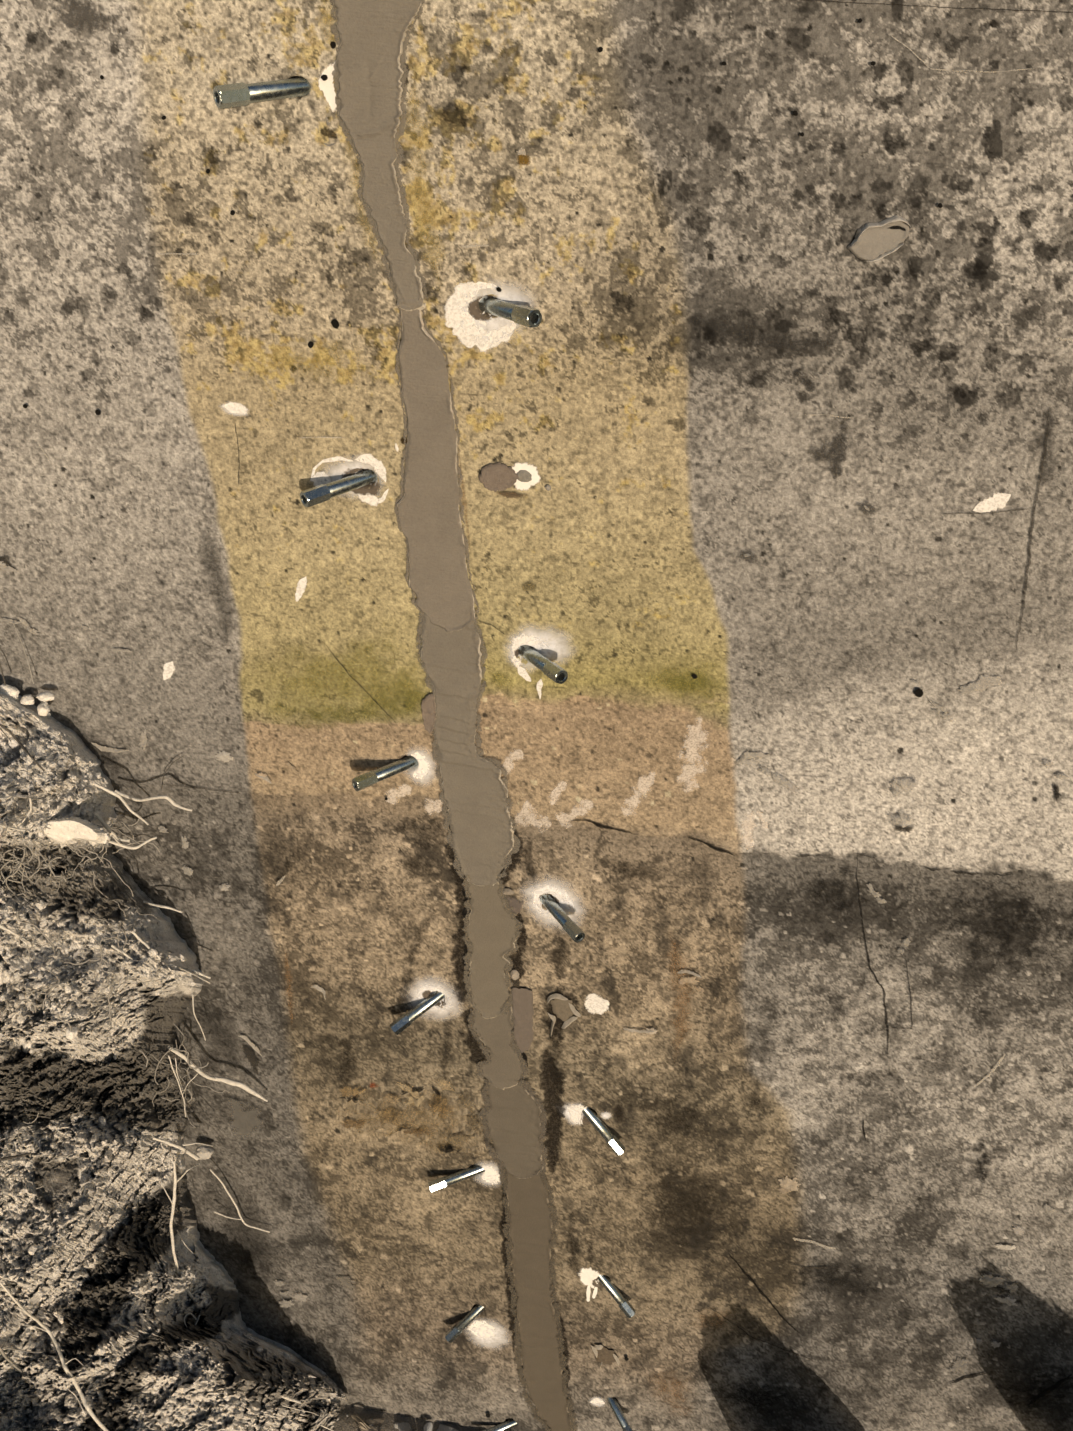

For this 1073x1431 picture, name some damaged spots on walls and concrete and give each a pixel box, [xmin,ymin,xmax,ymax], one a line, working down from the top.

crack [805,0,1072,13]
crack [944,417,1049,648]
crack [321,0,578,1431]
crack [573,820,639,836]
crack [688,837,735,856]
crack [923,866,1010,876]
water stain [949,888,1073,969]
crack [856,854,913,1053]
water stain [975,1143,989,1181]
crack [708,1254,814,1362]
crack [951,1373,986,1383]